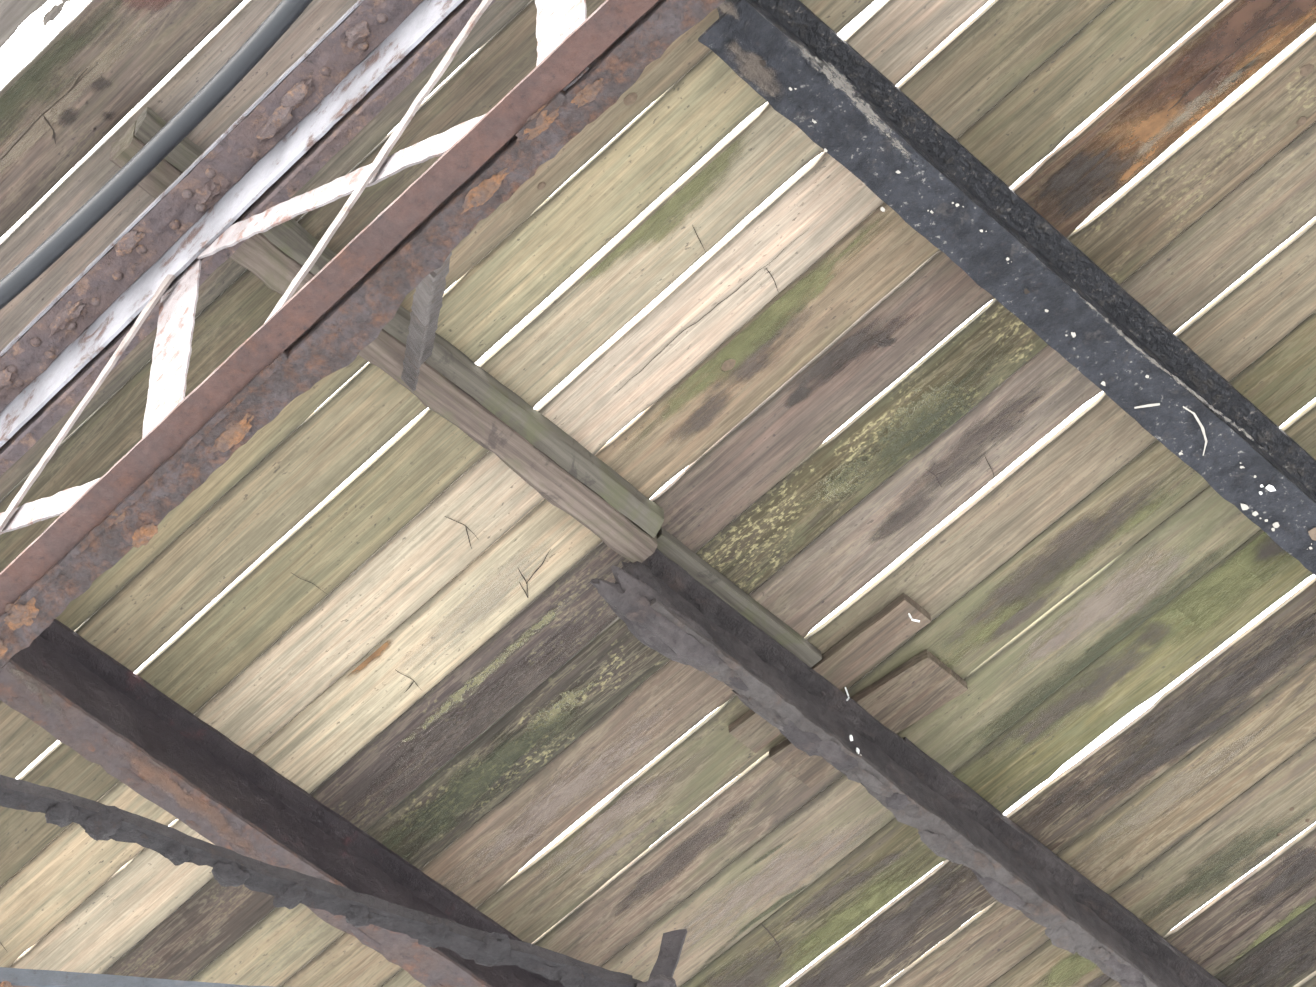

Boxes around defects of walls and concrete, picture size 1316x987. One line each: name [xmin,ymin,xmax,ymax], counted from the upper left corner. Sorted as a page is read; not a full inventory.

corrosion [718,2,739,18]
corrosion [728,43,780,97]
corrosion [1107,5,1316,185]
water stain [726,317,794,380]
water stain [787,320,903,406]
water stain [680,384,725,435]
water stain [971,500,1143,637]
corrosion [348,641,391,676]
water stain [381,636,575,800]
water stain [1017,625,1167,744]
water stain [1050,612,1316,810]